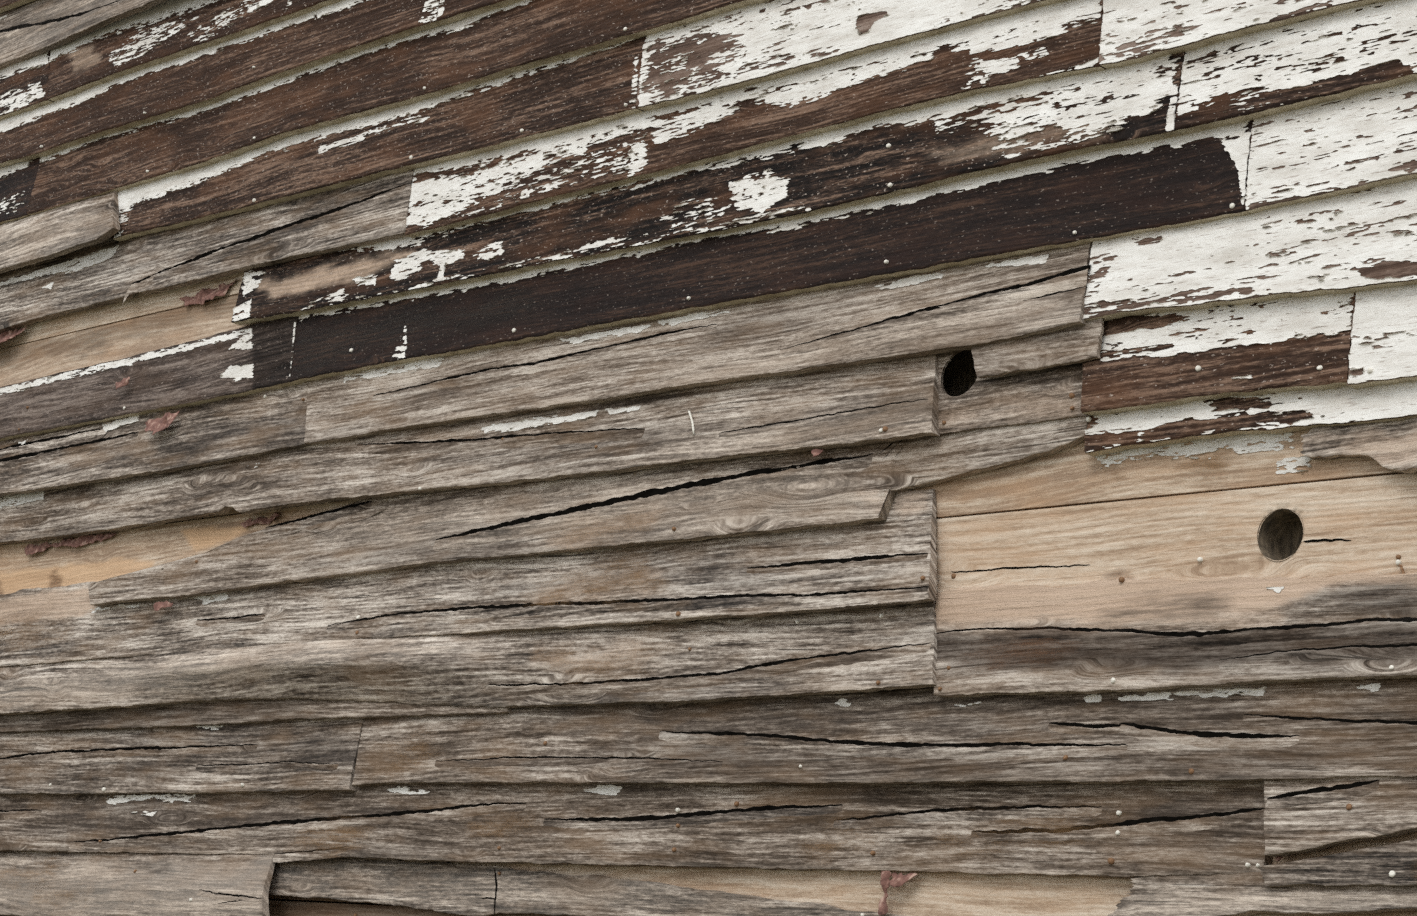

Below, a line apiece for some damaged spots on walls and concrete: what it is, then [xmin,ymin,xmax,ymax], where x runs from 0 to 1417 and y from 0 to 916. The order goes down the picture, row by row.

peeling [0,0,1417,474]
crack [719,399,928,437]
crack [0,428,139,469]
peeling [0,491,45,509]
crack [433,453,873,551]
crack [196,613,266,627]
crack [326,553,1089,633]
crack [486,617,1417,696]
crack [0,744,338,773]
crack [435,714,1417,770]
crack [68,780,1380,863]
crack [197,889,263,909]